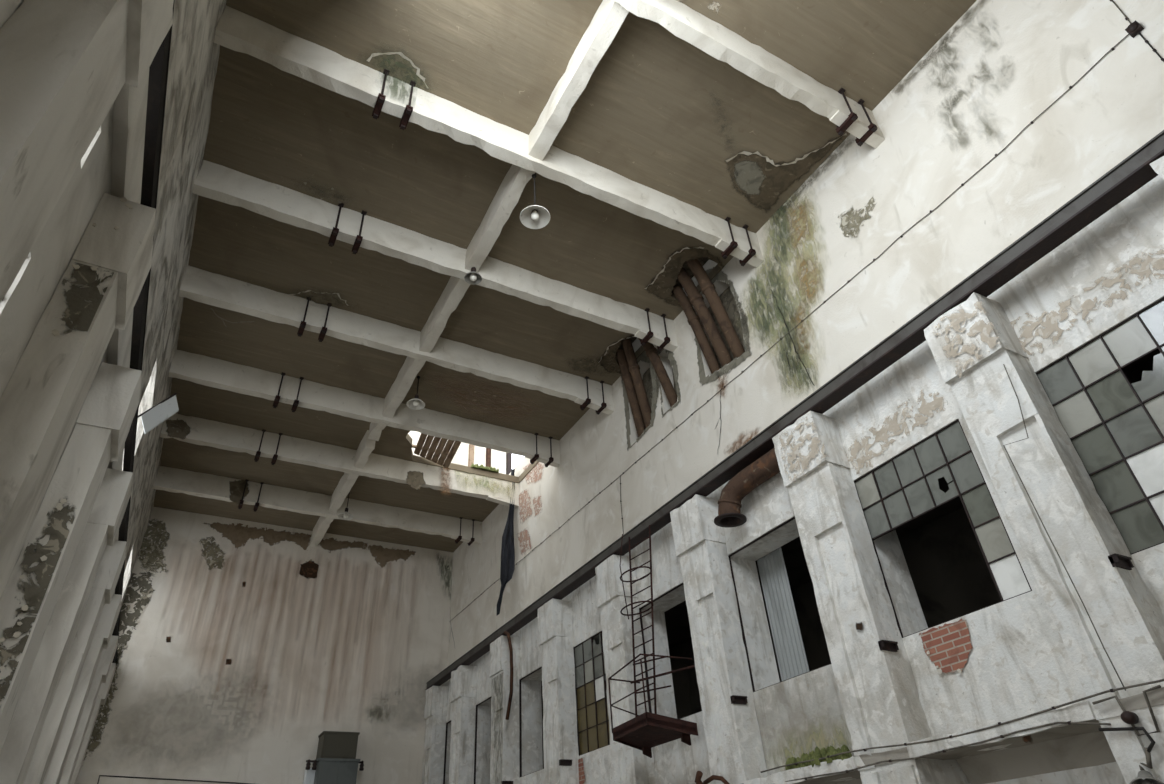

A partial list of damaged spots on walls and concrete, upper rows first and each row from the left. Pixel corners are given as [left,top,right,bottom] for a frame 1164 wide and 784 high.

spalling [726,133,847,211]
peeling [52,262,114,336]
damp [752,259,817,385]
peeling [1010,249,1164,355]
peeling [779,418,825,481]
flaking render [200,523,416,579]
peeling [0,498,75,701]
peeling [83,519,170,761]
flaking render [919,618,973,674]